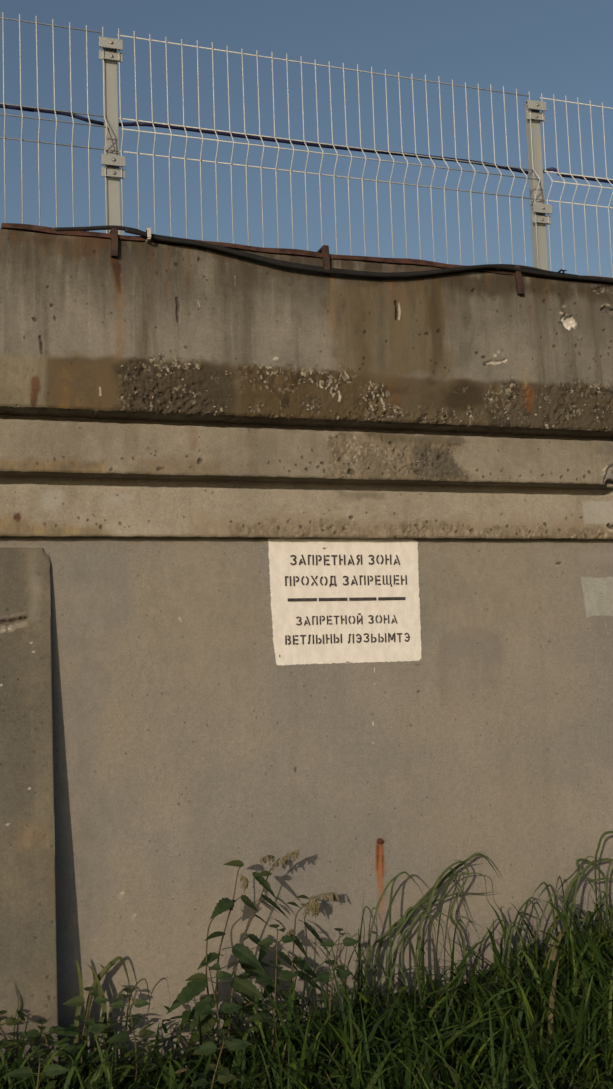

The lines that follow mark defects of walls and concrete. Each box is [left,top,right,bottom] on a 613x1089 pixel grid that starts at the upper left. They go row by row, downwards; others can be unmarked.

water stain [0,229,128,411]
water stain [143,242,613,394]
spalling [393,298,403,322]
spalling [554,303,579,333]
spalling [95,341,613,488]
corrosion [371,833,389,936]